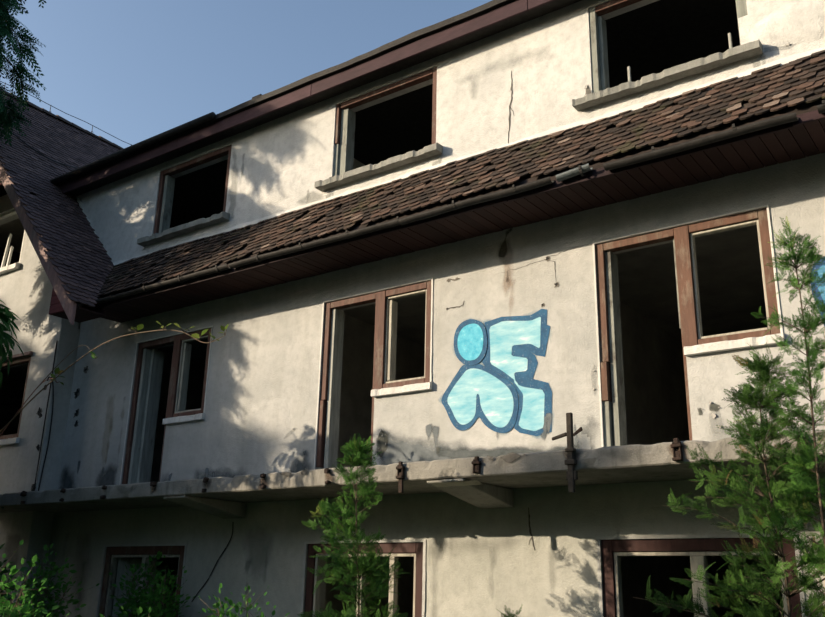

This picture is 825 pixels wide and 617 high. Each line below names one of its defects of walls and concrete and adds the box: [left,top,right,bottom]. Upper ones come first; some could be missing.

crack [507,71,515,143]
damp [376,424,537,465]
damp [541,413,552,439]
damp [97,467,116,486]